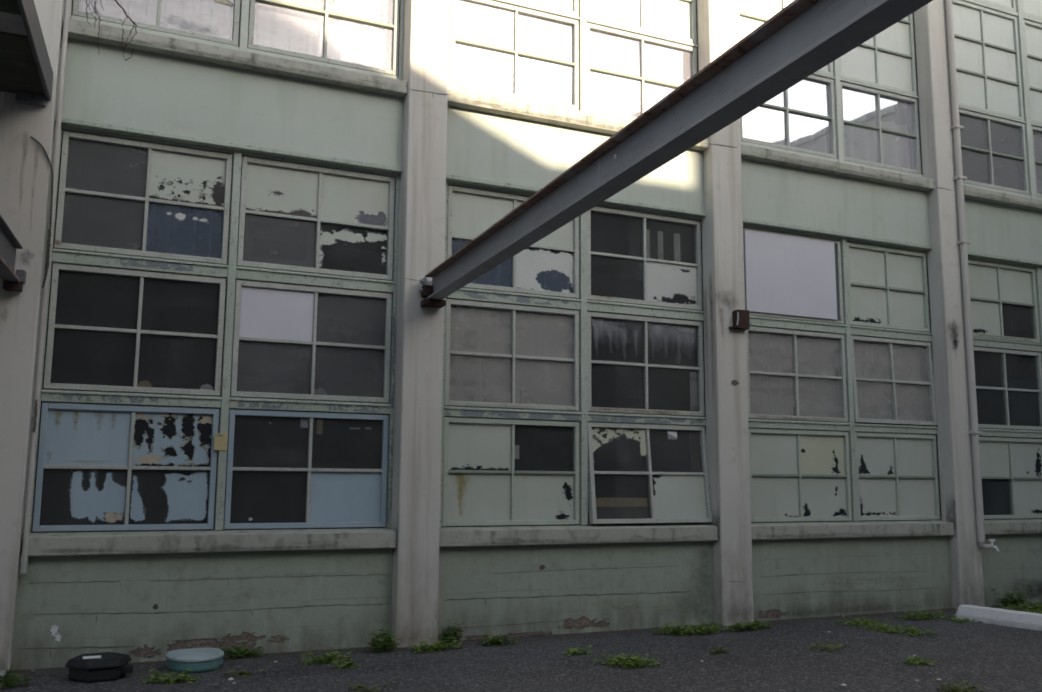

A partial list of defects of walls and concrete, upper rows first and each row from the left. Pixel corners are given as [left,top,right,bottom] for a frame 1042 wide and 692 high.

peeling [149,175,225,224]
peeling [245,207,388,268]
peeling [464,248,577,306]
peeling [59,393,213,524]
peeling [446,409,703,463]
peeling [831,450,841,496]
peeling [859,454,871,475]
peeling [860,497,896,516]
spalling [129,632,289,659]
spalling [442,616,610,640]